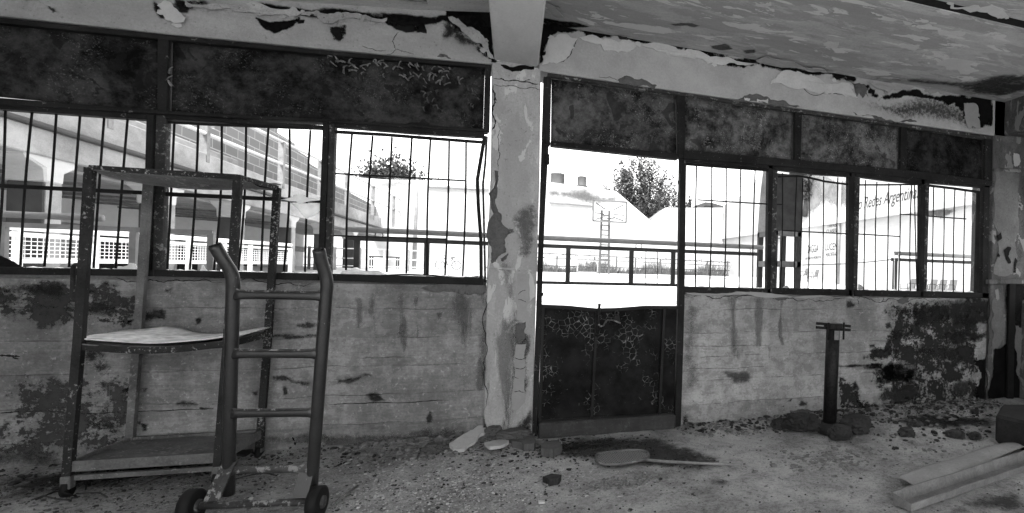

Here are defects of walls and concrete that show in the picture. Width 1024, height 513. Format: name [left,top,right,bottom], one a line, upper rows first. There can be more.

peeling [157,0,387,28]
peeling [448,16,494,59]
peeling [542,34,857,98]
peeling [964,103,980,129]
spalling [486,170,511,263]
peeling [993,153,1021,277]
leakage [0,281,74,329]
leakage [88,282,165,327]
leakage [839,298,988,409]
peeling [991,298,1022,376]
leakage [0,376,69,466]
leakage [78,350,148,451]